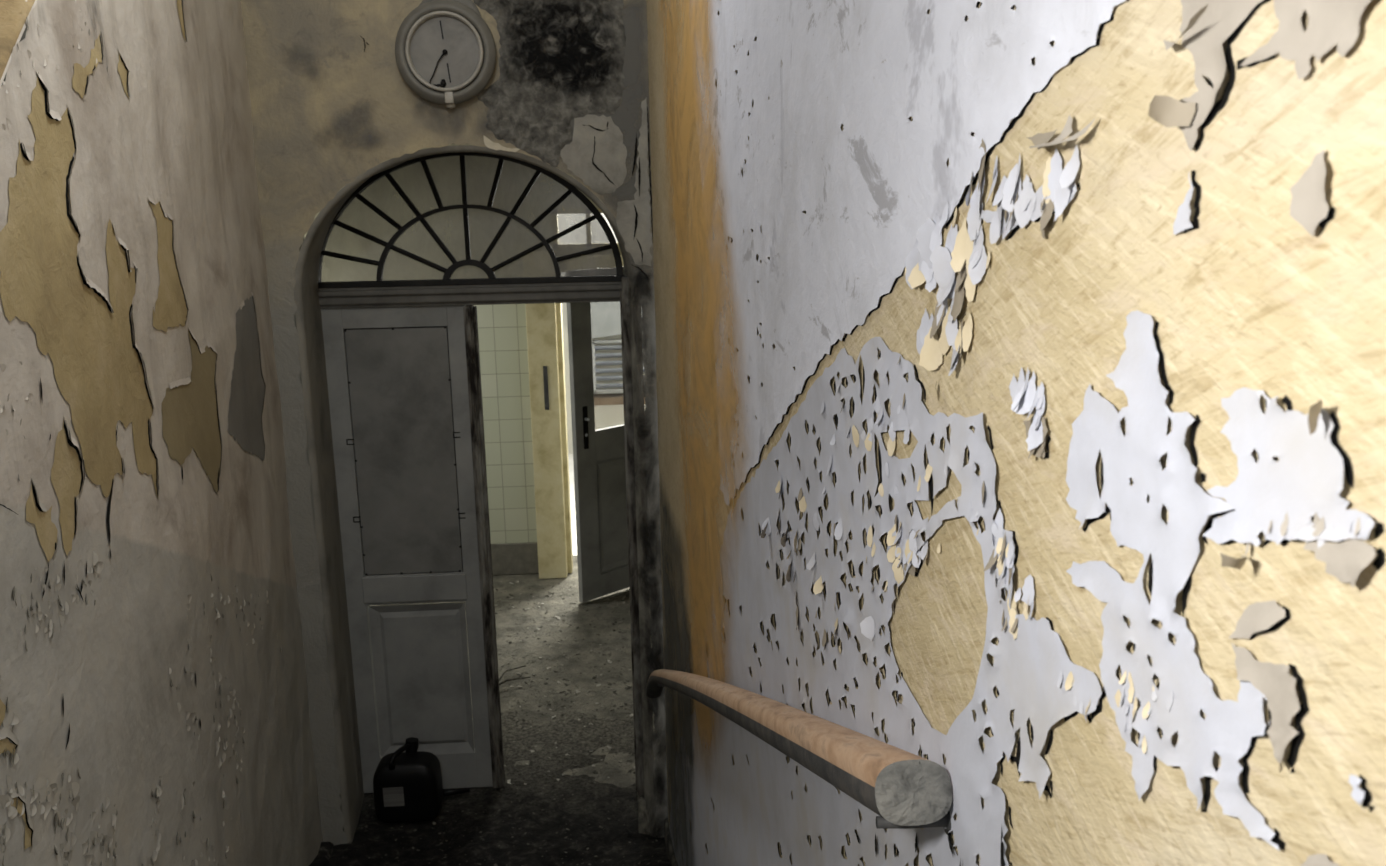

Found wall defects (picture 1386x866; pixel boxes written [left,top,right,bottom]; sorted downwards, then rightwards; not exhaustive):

flaking render [473,0,653,266]
damp [500,0,647,208]
peeling [0,0,266,651]
peeling [669,0,1384,866]
peeling [0,675,118,866]